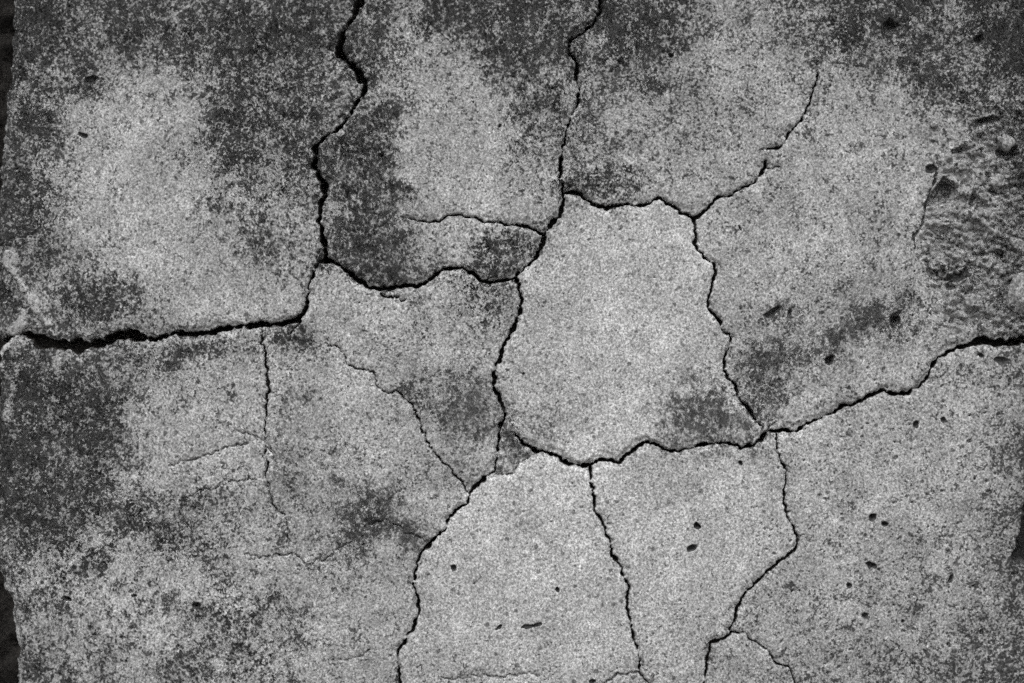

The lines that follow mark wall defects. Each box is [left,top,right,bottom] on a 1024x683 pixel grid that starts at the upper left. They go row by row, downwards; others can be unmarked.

crack [766,73,819,150]
crack [3,0,768,656]
crack [515,336,1024,683]